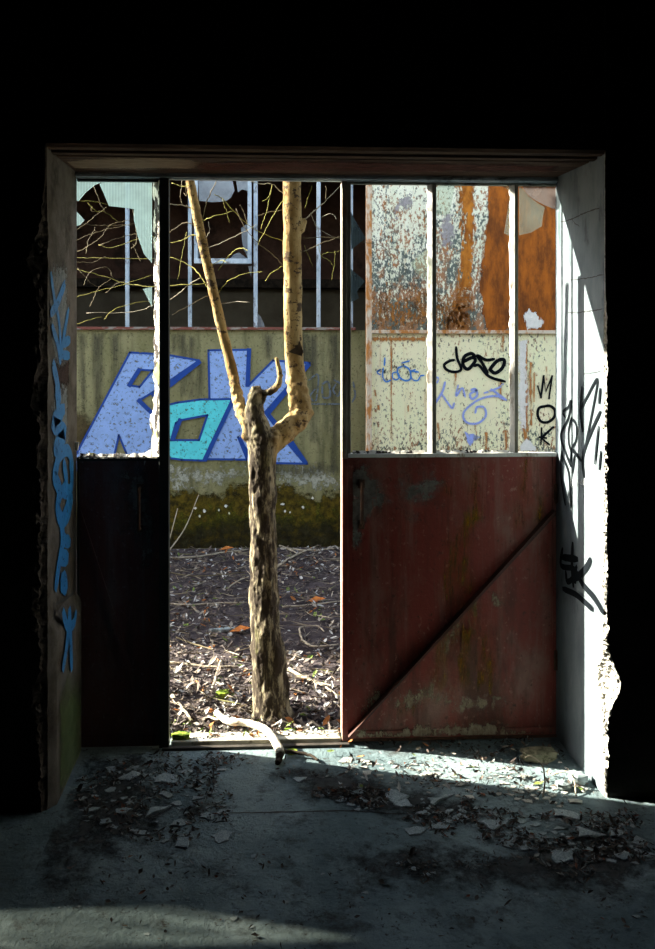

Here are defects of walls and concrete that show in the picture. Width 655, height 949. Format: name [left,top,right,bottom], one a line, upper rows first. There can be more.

peeling [394,193,413,220]
rust [372,186,556,440]
rust [355,722,552,738]
spalling [595,628,621,734]